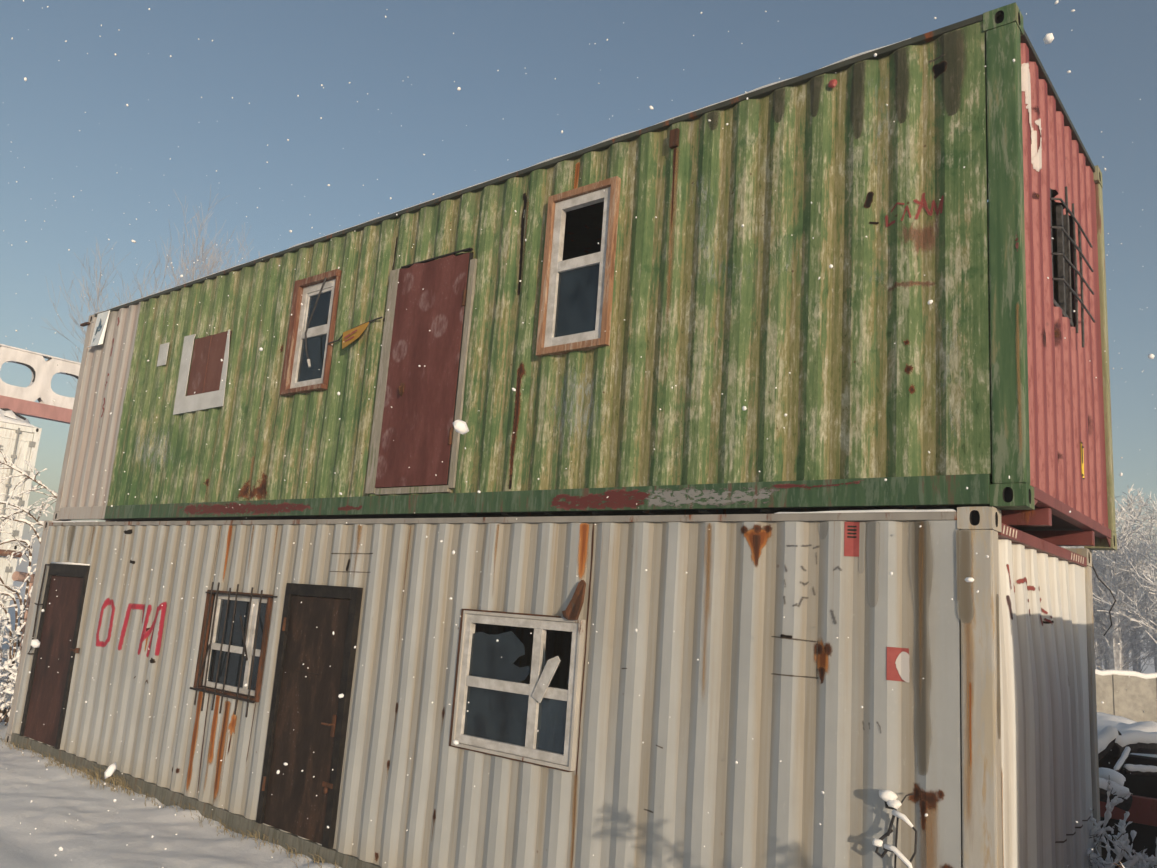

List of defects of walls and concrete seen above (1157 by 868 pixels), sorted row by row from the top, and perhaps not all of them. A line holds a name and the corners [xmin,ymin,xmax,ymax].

leakage [810,75,823,117]
leakage [850,61,865,139]
leakage [894,48,909,123]
leakage [939,30,966,116]
peeling [1021,63,1042,172]
rust [237,457,267,500]
peeling [549,480,864,510]
rust [741,525,772,567]
rust [814,640,832,683]
rust [172,691,238,800]
rust [908,783,952,868]